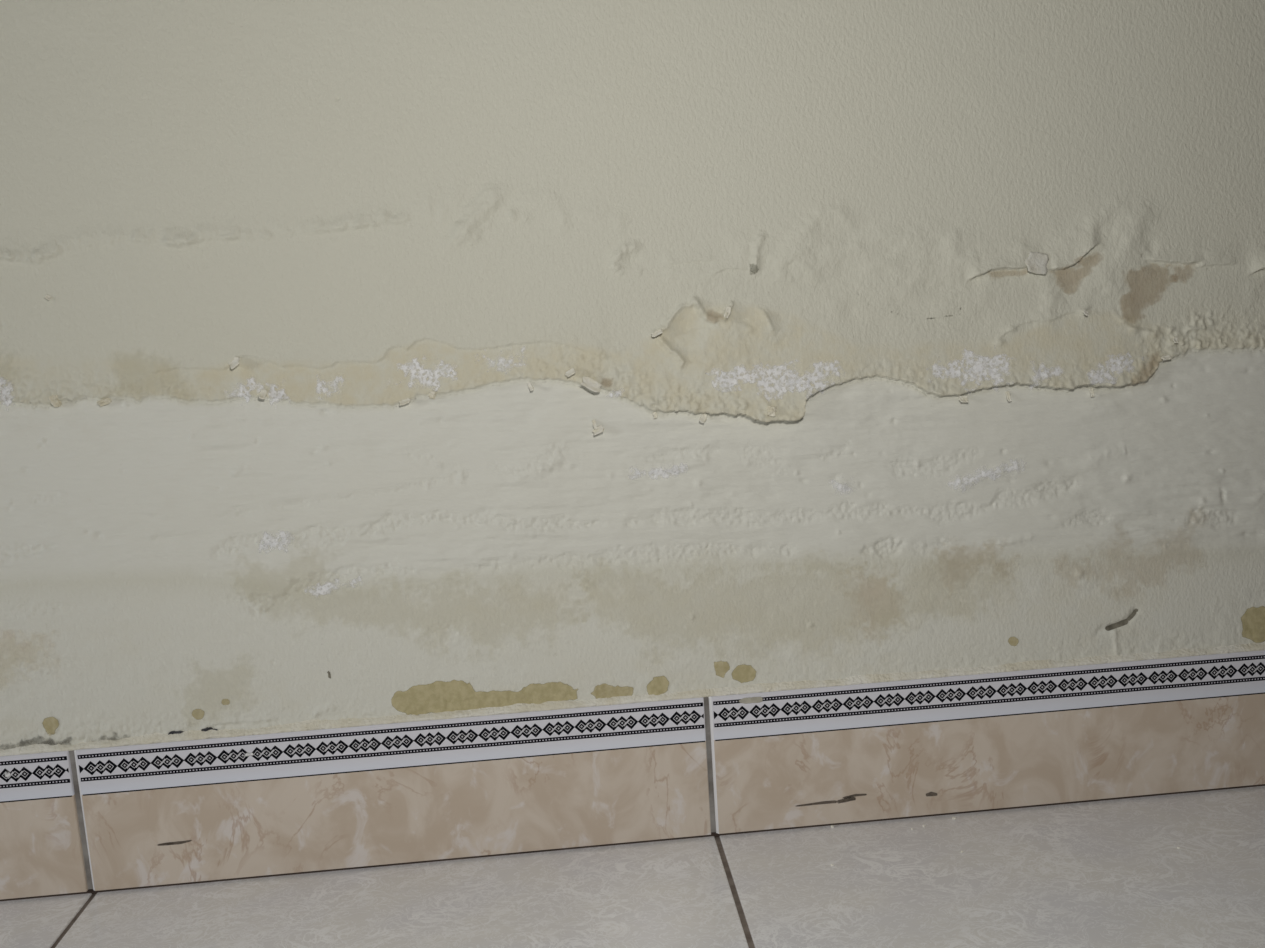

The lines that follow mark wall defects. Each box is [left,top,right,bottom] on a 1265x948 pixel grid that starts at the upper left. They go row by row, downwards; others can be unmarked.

flaking render [1169,291,1265,362]
peeling [0,322,620,409]
damp [398,358,457,391]
damp [706,360,840,401]
damp [933,349,1009,393]
damp [1241,606,1265,643]
damp [714,661,756,683]
damp [391,676,669,715]
damp [192,709,217,731]